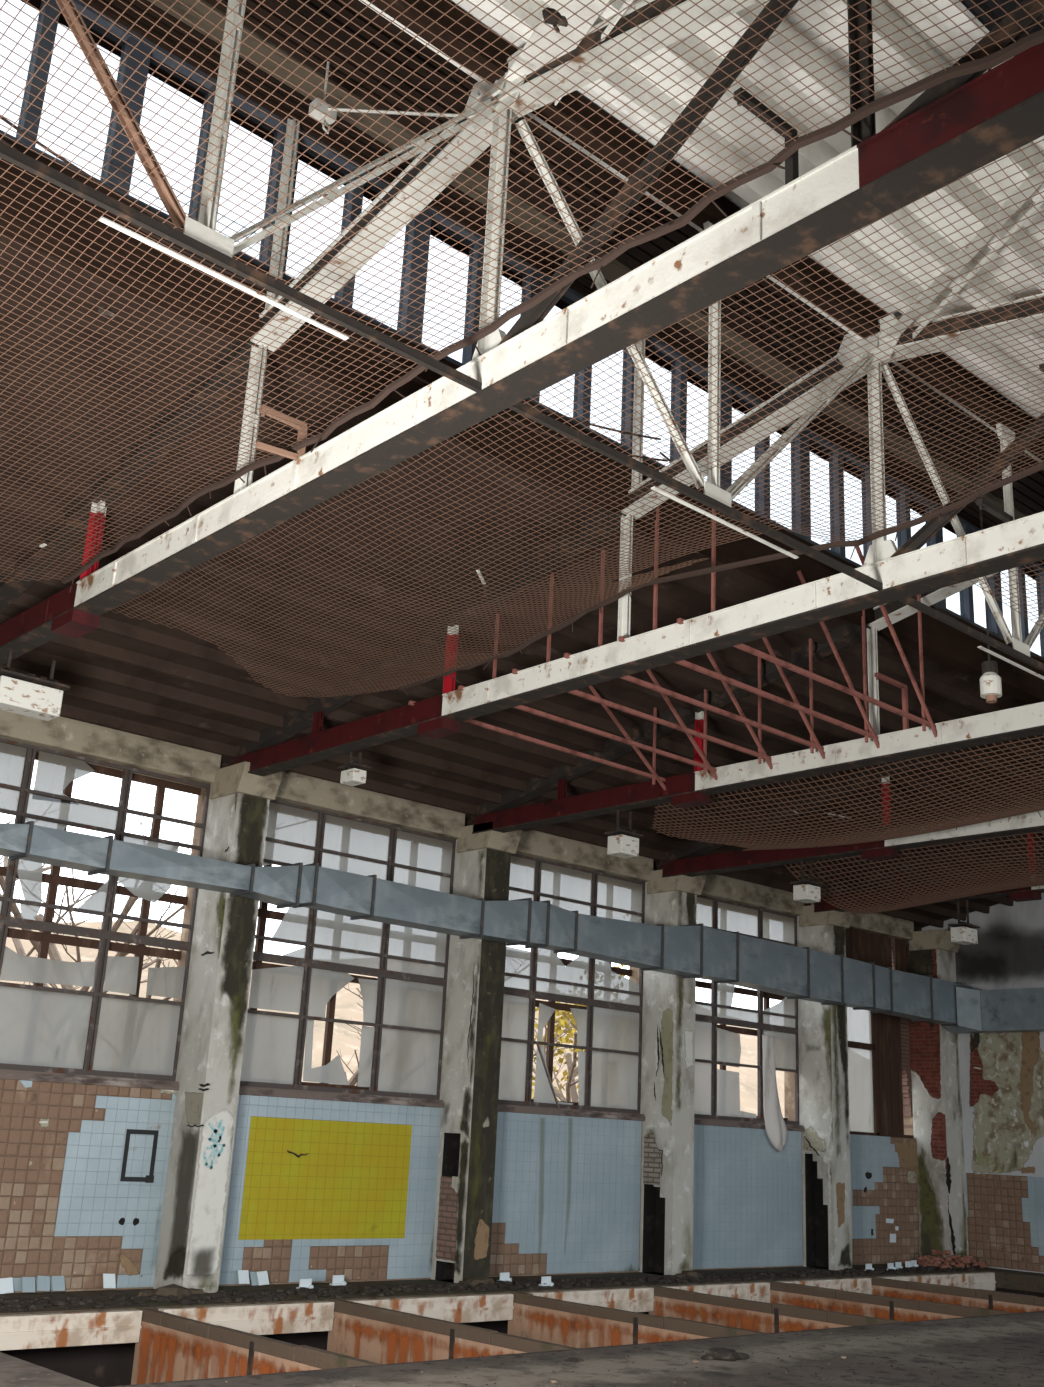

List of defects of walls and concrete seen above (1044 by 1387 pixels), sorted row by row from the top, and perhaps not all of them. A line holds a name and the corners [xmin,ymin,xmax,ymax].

damp [235,794,267,867]
damp [217,893,255,1087]
flaking render [891,938,938,979]
peeling [0,1079,177,1290]
peeling [802,1112,832,1234]
peeling [852,1017,1044,1272]
peeling [242,1239,389,1289]
peeling [489,1223,554,1286]
rust [137,1329,298,1384]
rust [346,1323,433,1364]
rust [526,1313,592,1343]
rust [656,1280,972,1332]